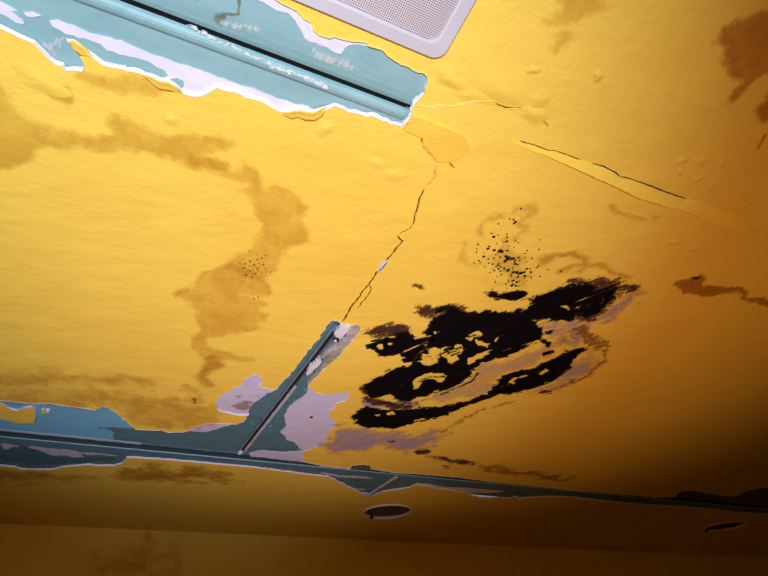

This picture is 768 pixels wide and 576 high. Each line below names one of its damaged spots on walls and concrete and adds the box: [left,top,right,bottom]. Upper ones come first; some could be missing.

peeling [0,0,428,127]
crack [416,100,525,110]
peeling [0,320,768,514]
crack [341,138,455,321]
mould [320,233,641,469]
damp [674,276,768,306]